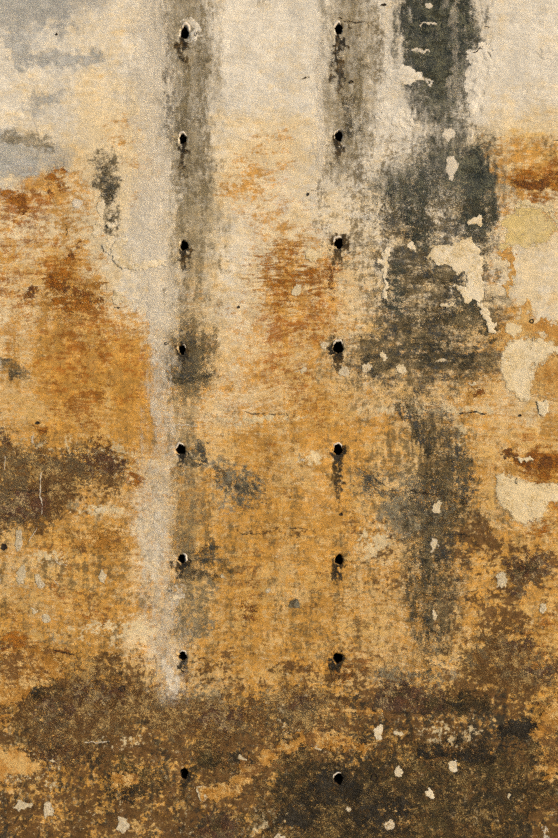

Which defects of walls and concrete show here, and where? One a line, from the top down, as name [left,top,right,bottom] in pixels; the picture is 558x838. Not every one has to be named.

water stain [312,0,381,172]
corrosion [0,189,29,215]
water stain [92,149,122,236]
water stain [126,0,219,421]
peeling [467,214,483,227]
corrosion [507,167,558,203]
corrosion [18,241,104,305]
corrosion [249,239,336,308]
water stain [327,0,558,656]
peeling [407,237,558,417]
peeling [495,472,558,524]
corrosion [500,446,558,484]